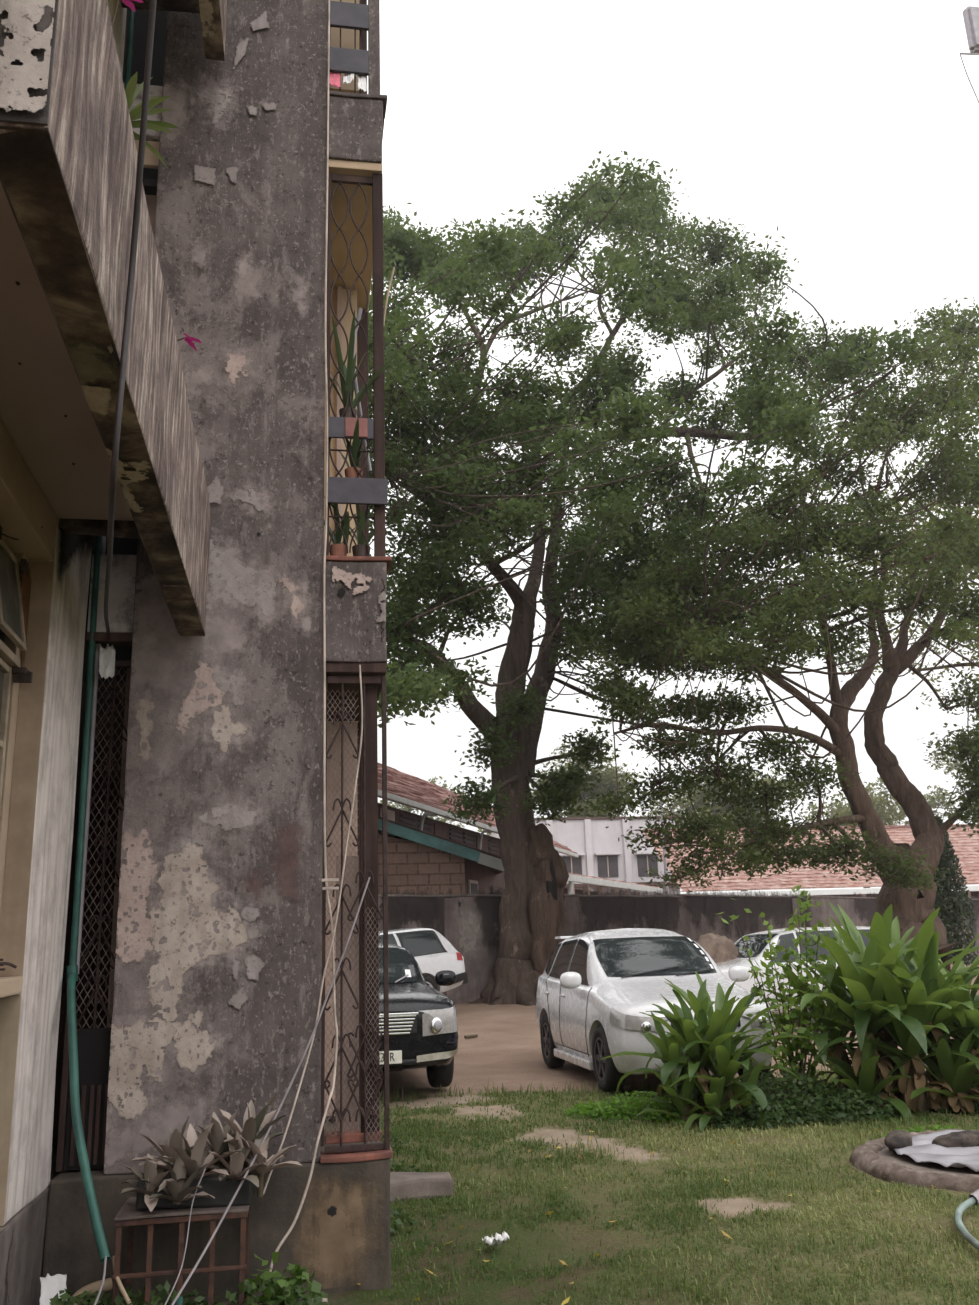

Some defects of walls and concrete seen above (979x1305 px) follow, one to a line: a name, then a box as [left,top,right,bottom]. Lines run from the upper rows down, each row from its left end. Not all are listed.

peeling [0,0,55,113]